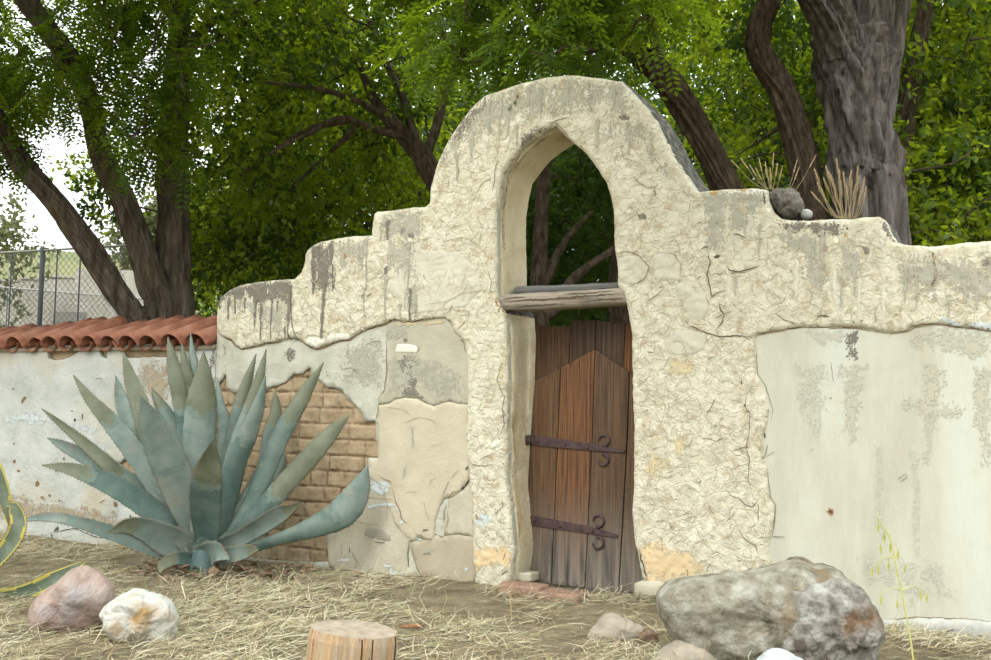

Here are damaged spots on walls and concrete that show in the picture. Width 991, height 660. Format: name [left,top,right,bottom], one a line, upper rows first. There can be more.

spalling [216,378,237,446]
leakage [217,279,295,362]
spalling [238,369,378,562]
leakage [310,209,466,402]
crack [619,246,986,577]